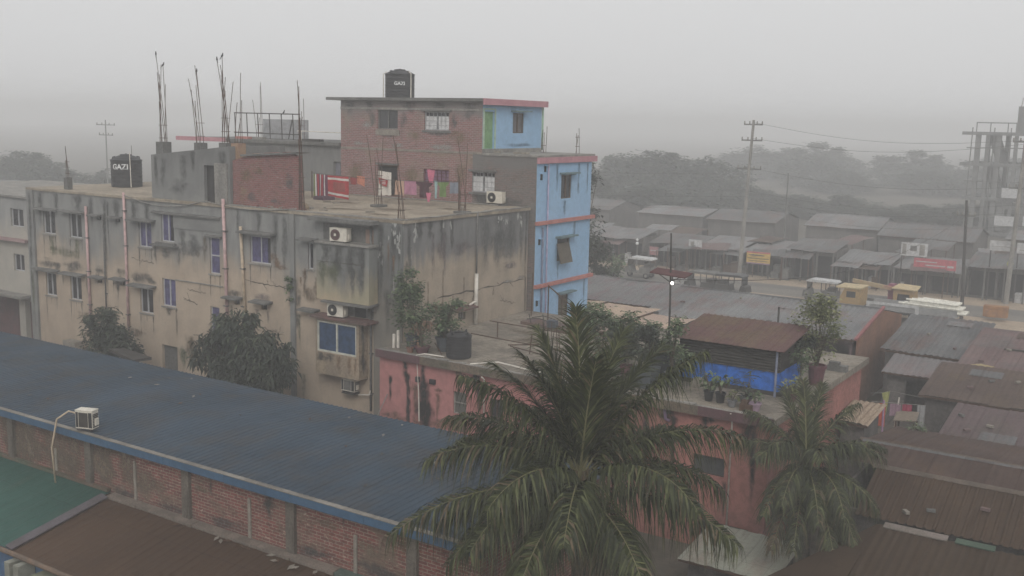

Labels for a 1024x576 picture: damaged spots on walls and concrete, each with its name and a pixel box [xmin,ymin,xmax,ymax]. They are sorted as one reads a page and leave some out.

crack [421,279,522,314]
damp [387,362,441,426]